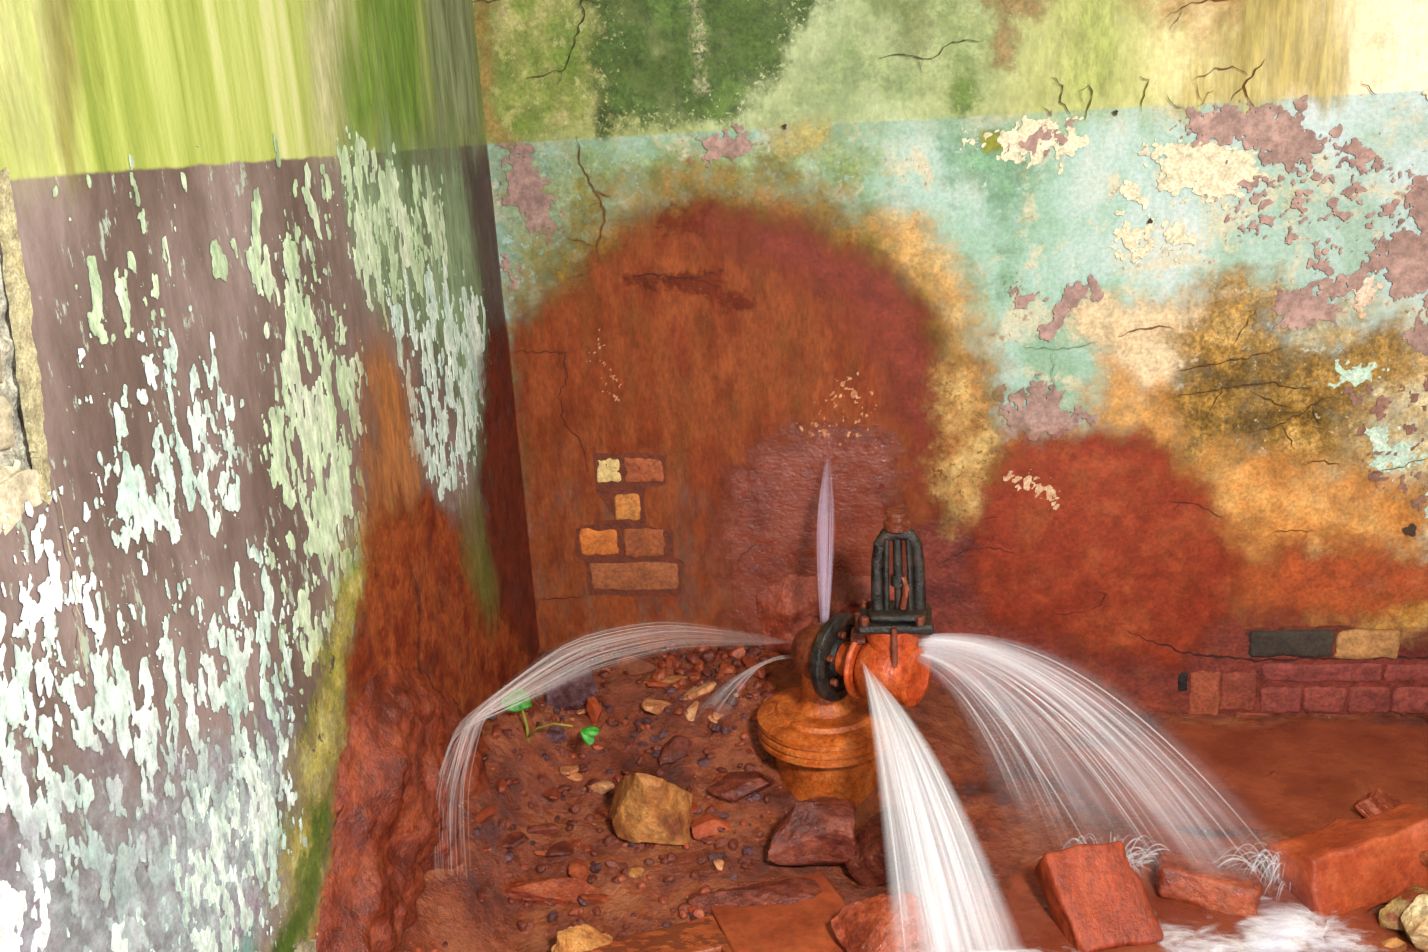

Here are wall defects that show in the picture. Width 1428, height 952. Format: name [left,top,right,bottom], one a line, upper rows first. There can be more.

water stain [689,0,709,91]
peeling [959,110,1090,175]
crack [1167,0,1223,30]
crack [1140,59,1265,112]
peeling [1111,95,1428,356]
peeling [0,126,490,952]
flaking render [574,452,684,596]
water stain [709,423,908,650]
rust [340,165,1428,760]
peeling [1003,469,1060,510]
peeling [1327,356,1428,519]
water stain [14,926,31,952]